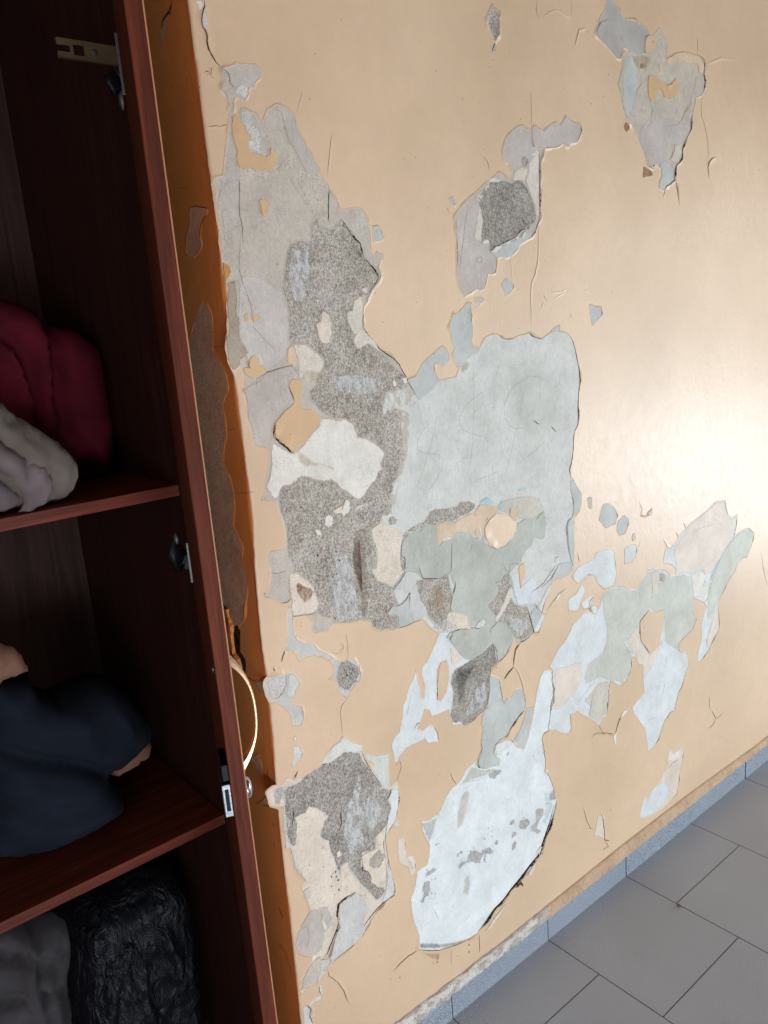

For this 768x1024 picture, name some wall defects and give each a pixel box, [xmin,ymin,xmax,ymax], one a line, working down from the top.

crack [160,0,223,66]
peeling [484,3,502,52]
peeling [593,0,717,206]
peeling [185,61,754,1024]